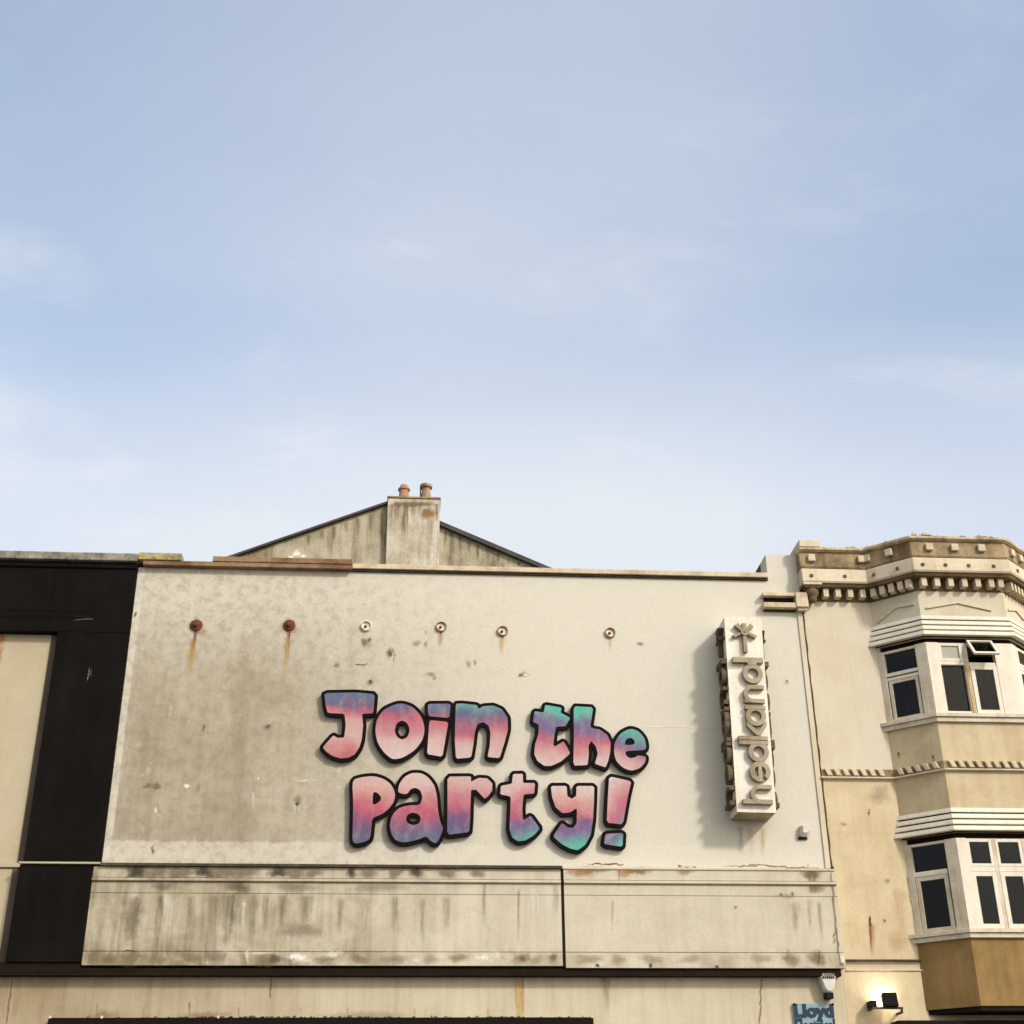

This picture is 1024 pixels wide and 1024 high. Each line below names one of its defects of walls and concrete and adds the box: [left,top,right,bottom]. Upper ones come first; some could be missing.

leakage [307,502,438,542]
leakage [130,867,254,878]